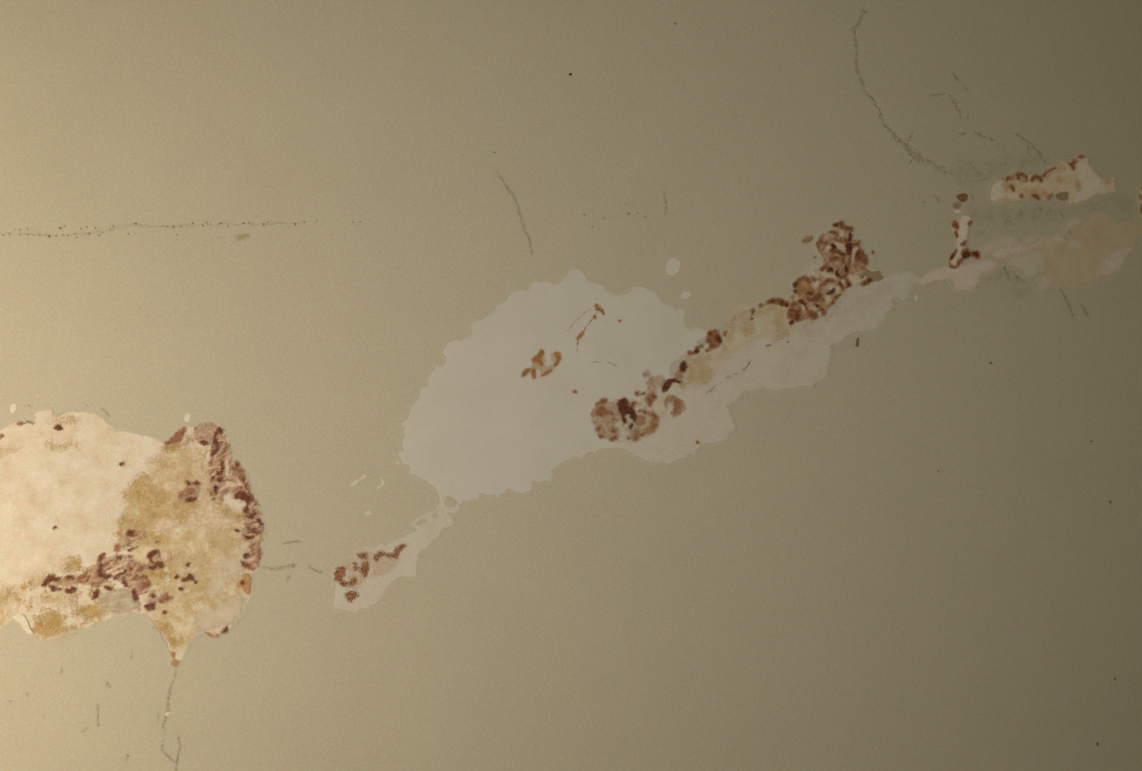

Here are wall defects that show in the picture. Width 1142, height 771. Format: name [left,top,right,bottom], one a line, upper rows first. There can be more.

corrosion [952,193,968,214]
flaking render [986,154,1119,208]
flaking render [947,213,981,269]
peeling [329,218,922,617]
flaking render [0,404,268,669]